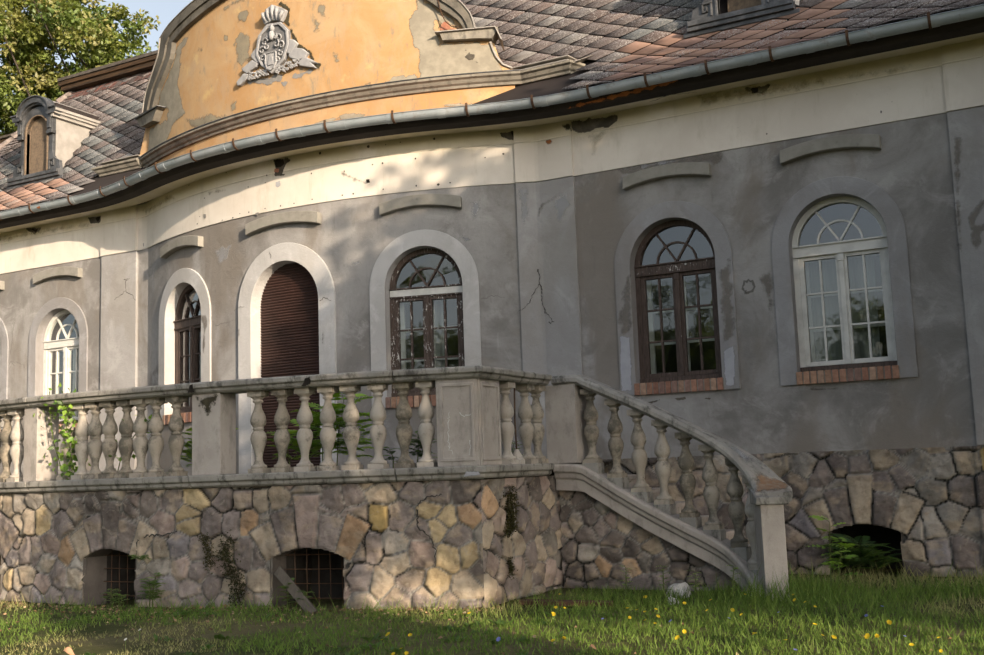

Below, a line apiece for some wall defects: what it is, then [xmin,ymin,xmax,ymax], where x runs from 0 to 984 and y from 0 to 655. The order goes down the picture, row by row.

peeling [224,0,250,66]
peeling [387,0,502,82]
peeling [148,37,236,151]
peeling [246,68,313,87]
crack [484,269,554,324]